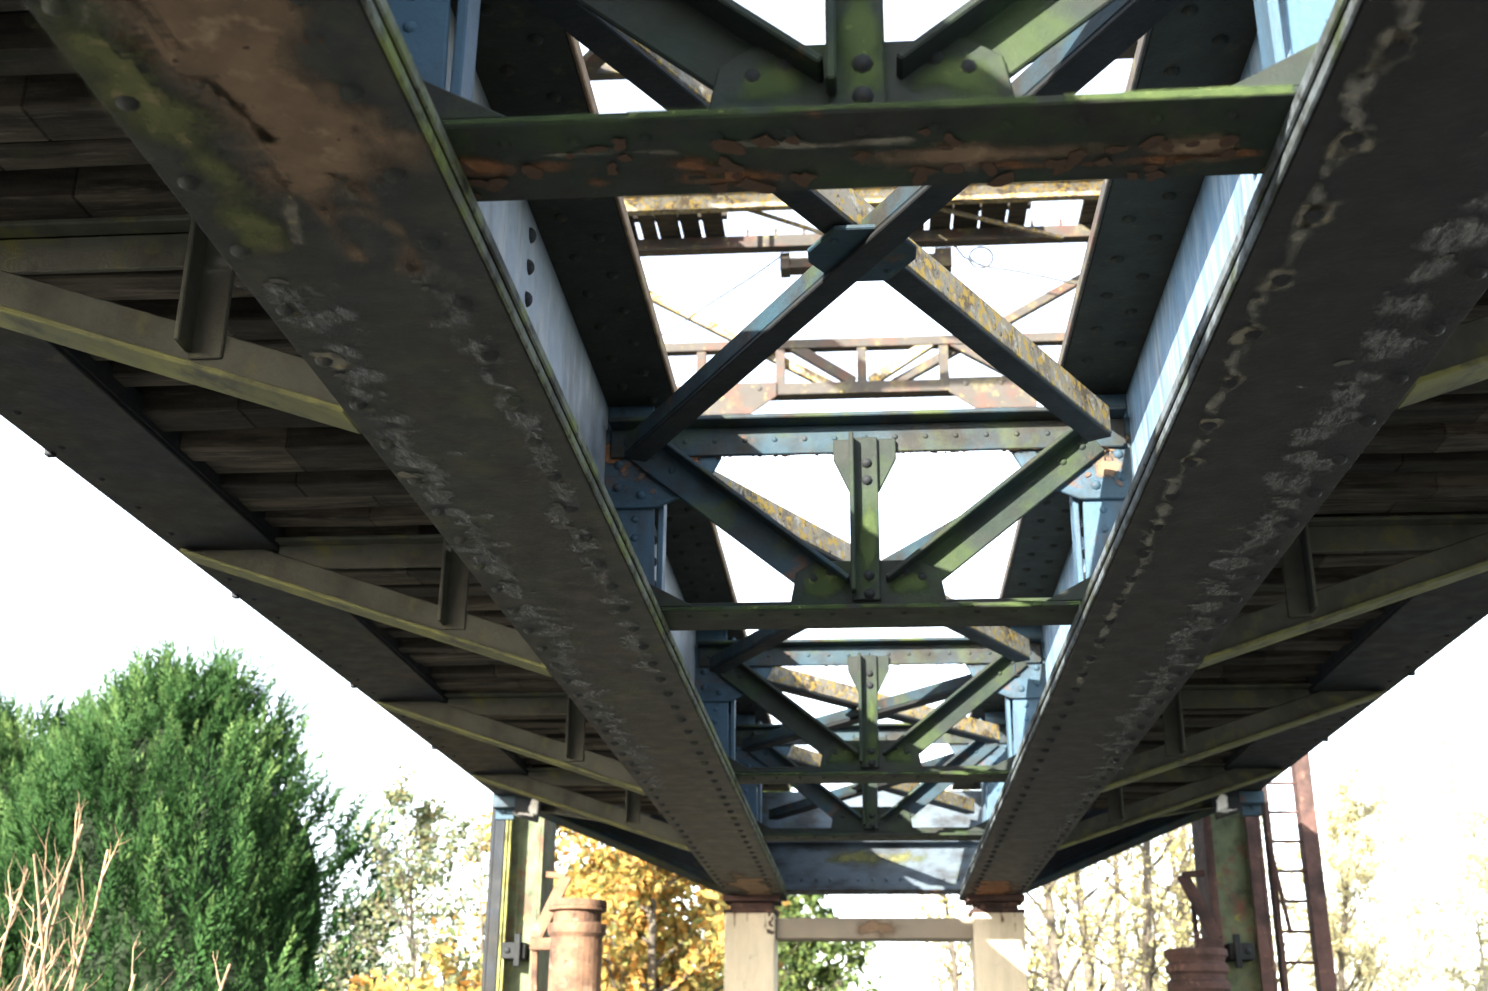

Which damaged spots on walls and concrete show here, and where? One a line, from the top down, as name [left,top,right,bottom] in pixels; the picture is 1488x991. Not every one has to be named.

peeling [262,278,665,789]
rust [459,159,544,200]
peeling [1076,0,1488,711]